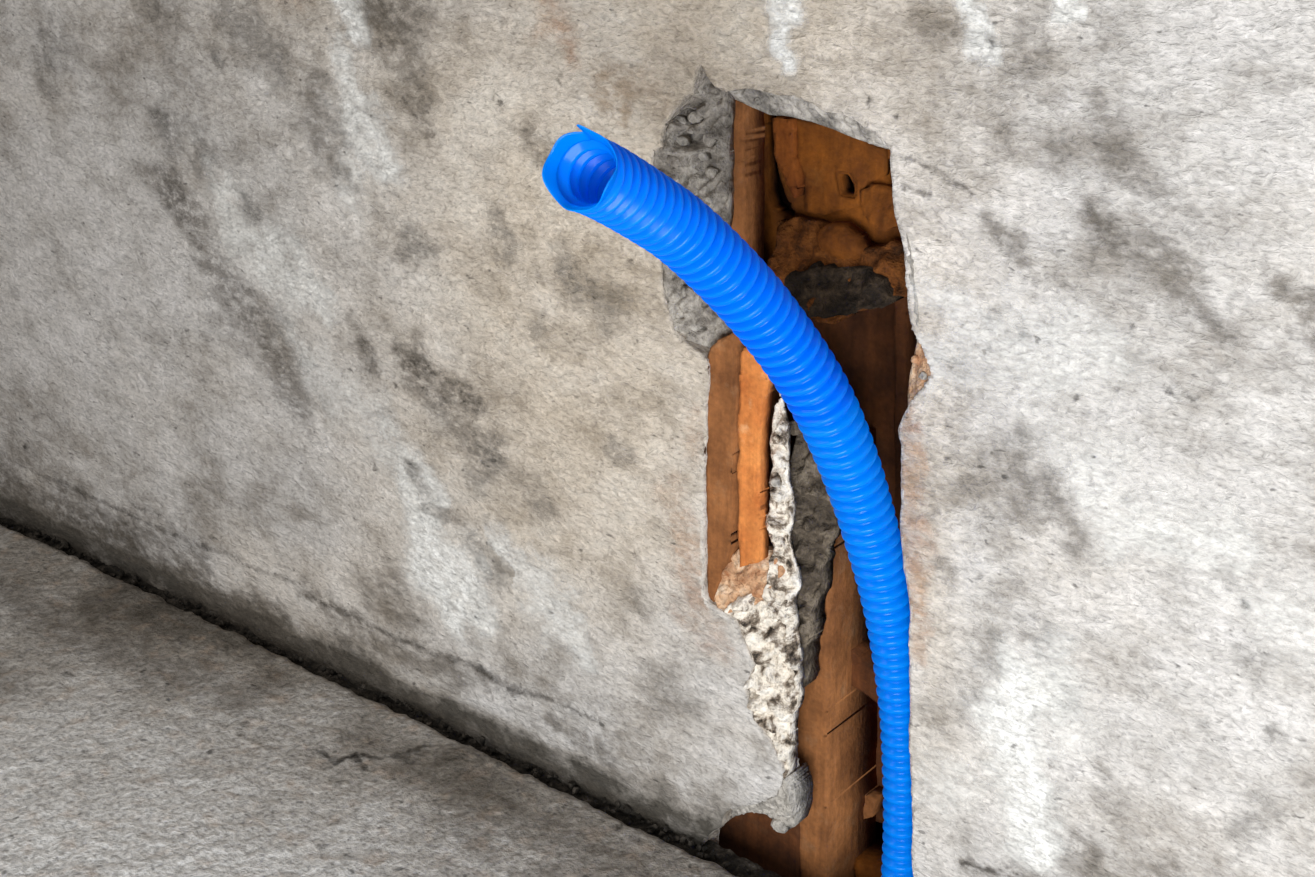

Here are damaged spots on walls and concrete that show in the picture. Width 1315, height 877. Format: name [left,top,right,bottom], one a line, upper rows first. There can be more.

spalling [653,75,934,406]
crack [0,517,781,877]
spalling [714,393,813,833]